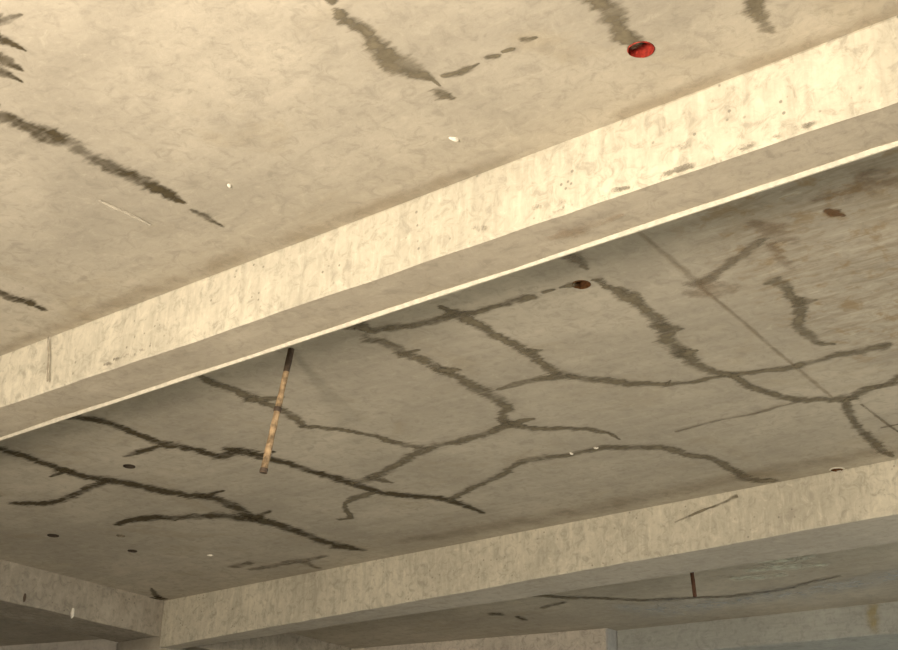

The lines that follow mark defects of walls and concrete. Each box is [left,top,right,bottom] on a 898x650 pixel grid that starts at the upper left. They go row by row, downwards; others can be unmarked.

crack [585,0,641,46]
crack [0,36,26,82]
crack [325,0,537,100]
crack [0,113,69,144]
crack [92,157,222,226]
crack [0,290,46,311]
crack [68,279,898,520]
crack [0,447,364,570]
crack [532,576,841,609]